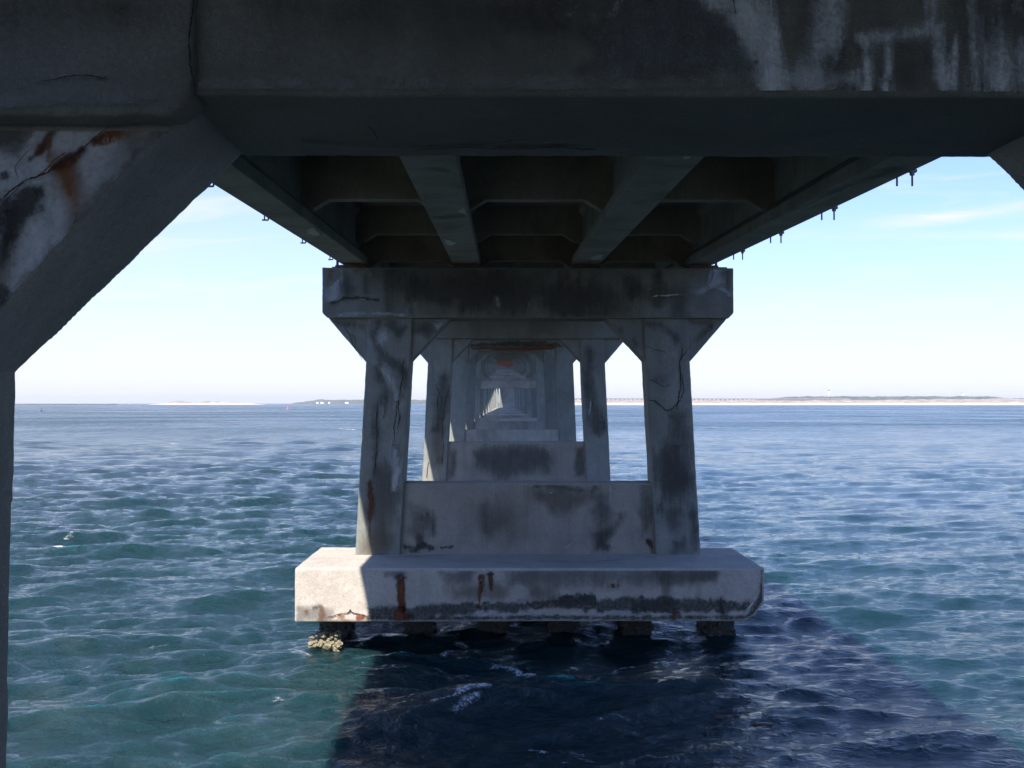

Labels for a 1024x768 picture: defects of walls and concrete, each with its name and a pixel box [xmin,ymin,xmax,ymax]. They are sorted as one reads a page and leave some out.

damp [851,0,1024,91]
crack [0,127,108,201]
rust [29,131,129,213]
damp [0,131,150,297]
crack [647,345,691,411]
crack [374,360,404,474]
rust [305,607,364,621]
rust [393,574,413,621]
rust [478,572,494,608]
damp [367,593,750,620]